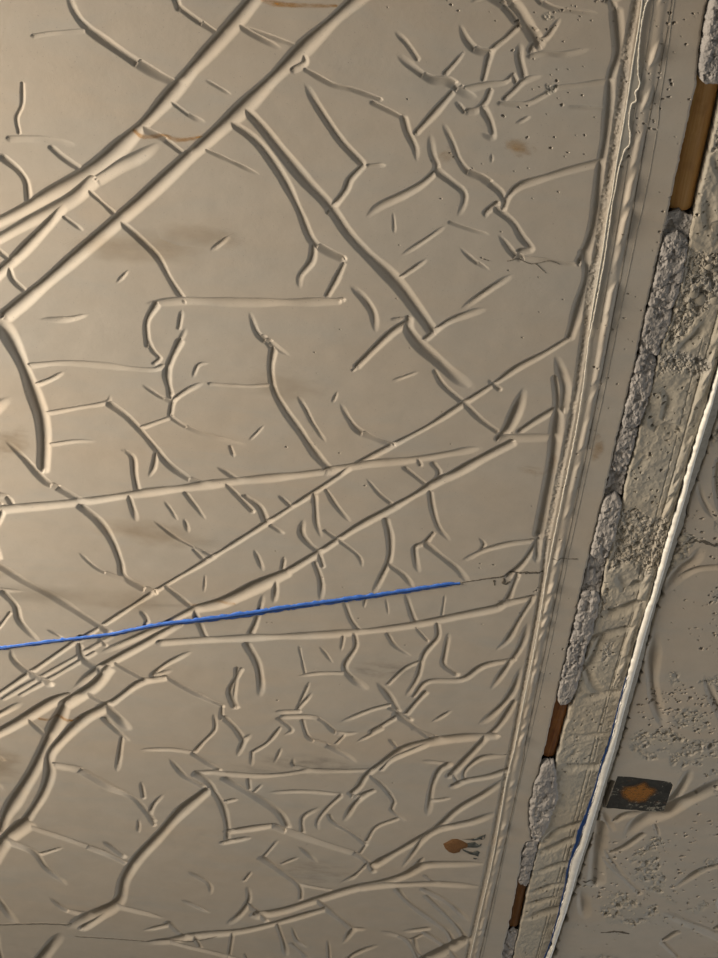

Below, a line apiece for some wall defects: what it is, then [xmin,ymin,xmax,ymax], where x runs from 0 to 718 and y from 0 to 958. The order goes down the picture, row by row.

crack [481,258,560,271]
crack [689,539,718,547]
crack [462,558,577,586]
rust [622,783,654,802]
rust [443,834,486,860]
crack [0,922,217,942]